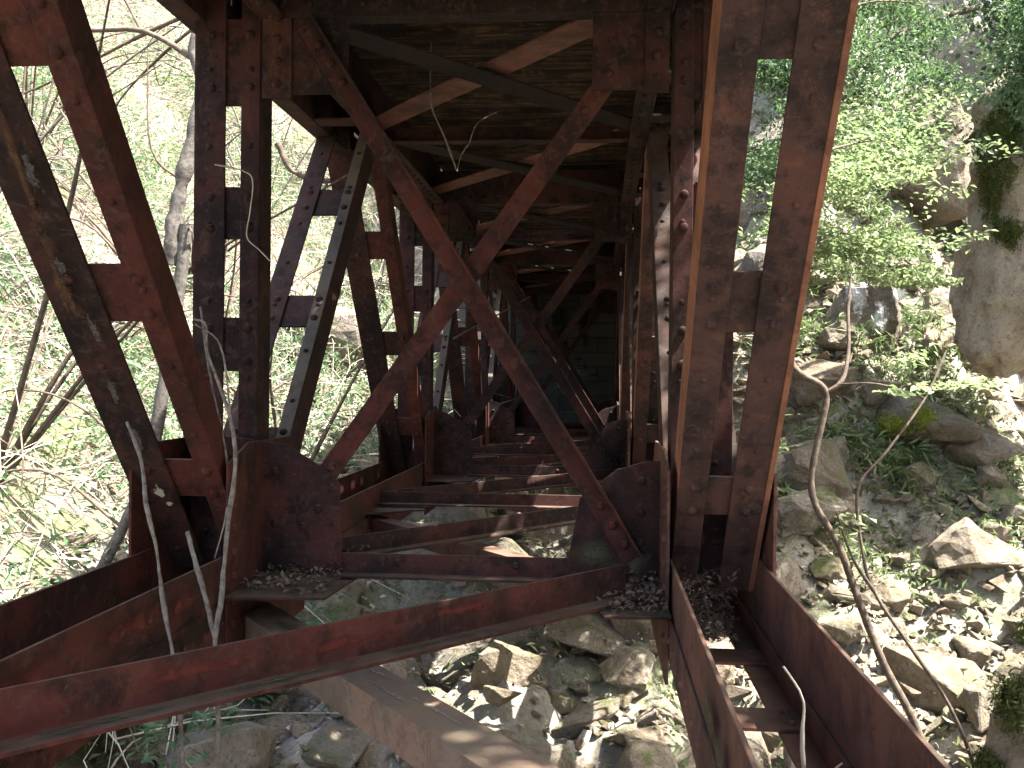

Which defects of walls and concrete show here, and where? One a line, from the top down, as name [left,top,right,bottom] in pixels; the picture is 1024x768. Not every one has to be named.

corrosion [0,121,44,205]
corrosion [134,615,210,662]